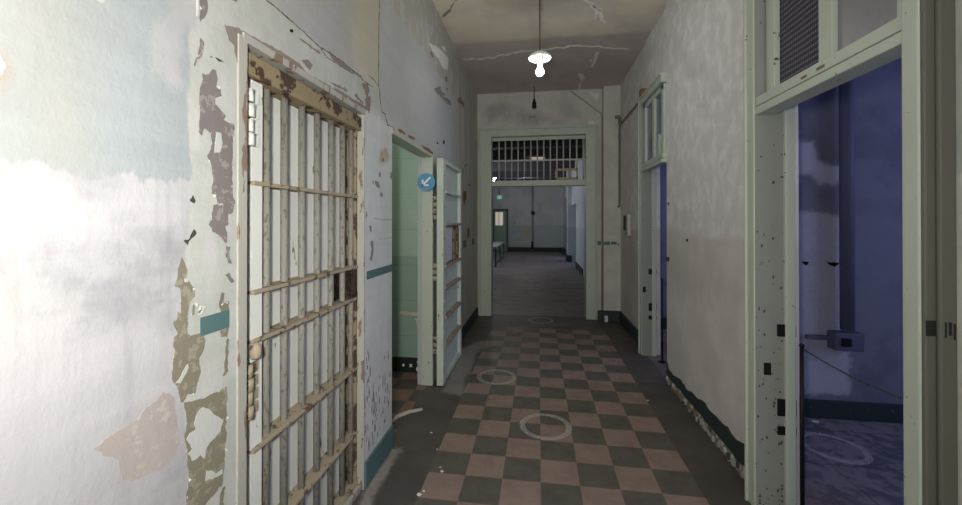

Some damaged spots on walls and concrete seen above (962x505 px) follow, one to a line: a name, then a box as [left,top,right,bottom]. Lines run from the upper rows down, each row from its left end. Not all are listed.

peeling [199,0,208,21]
peeling [224,25,371,112]
crack [463,0,629,60]
peeling [194,38,235,283]
flaking render [94,258,230,505]
flaking render [666,375,744,479]